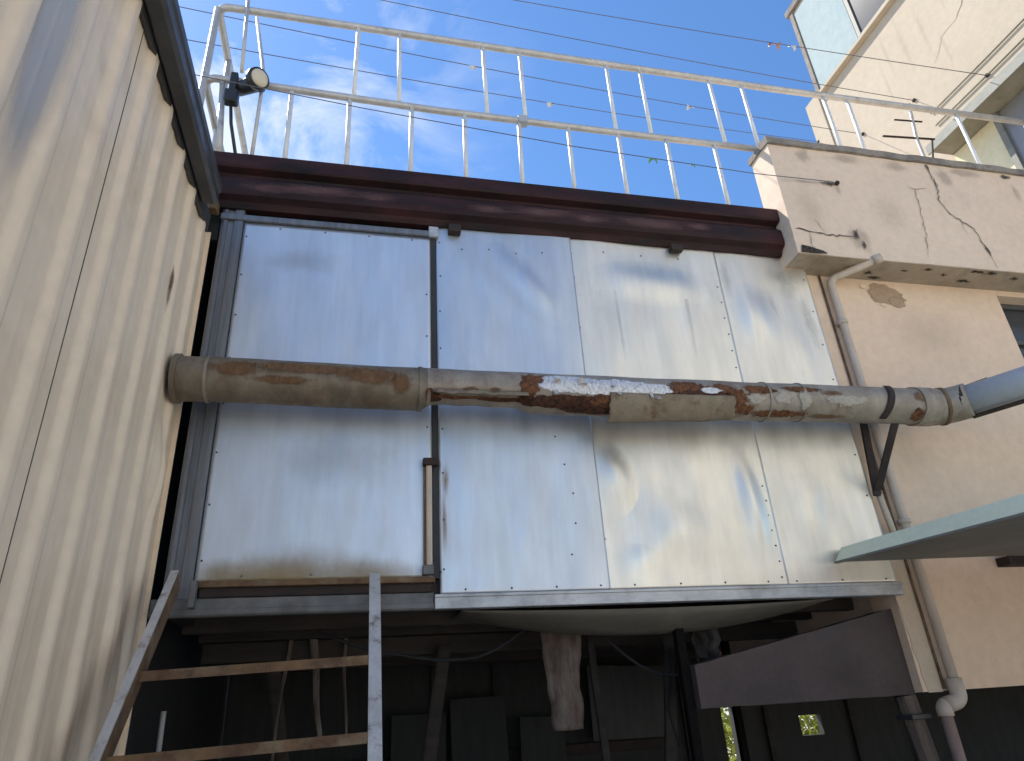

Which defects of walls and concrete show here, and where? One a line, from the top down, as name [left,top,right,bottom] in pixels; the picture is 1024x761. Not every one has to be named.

crack [913,165,998,268]
crack [799,219,854,246]
peeling [860,283,908,308]
corrosion [426,374,611,415]
peeling [539,376,673,399]
corrosion [666,381,844,418]
corrosion [910,392,925,421]